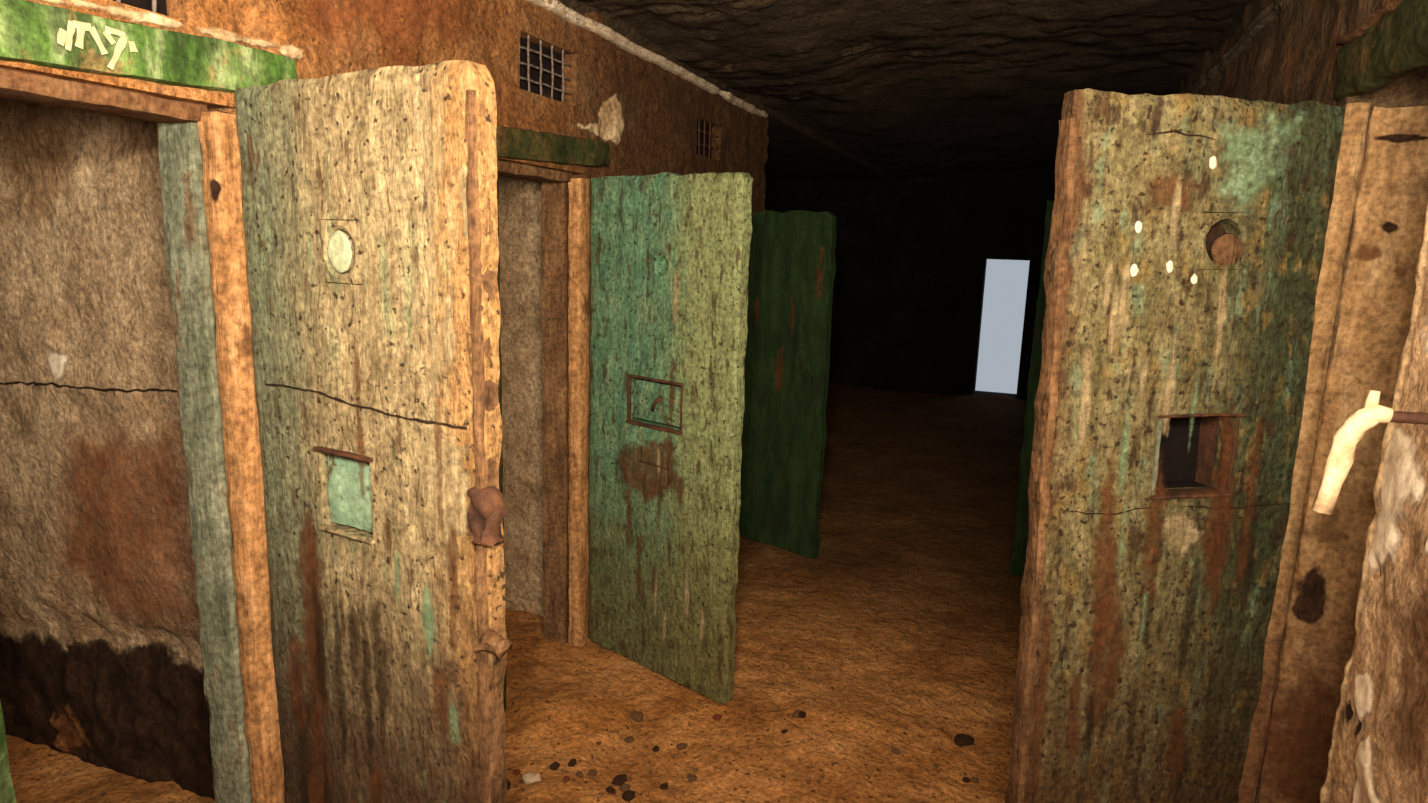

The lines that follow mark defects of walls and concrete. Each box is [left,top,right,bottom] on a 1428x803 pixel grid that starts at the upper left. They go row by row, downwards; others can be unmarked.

crack [0,381,178,393]
rust [300,515,328,735]
rust [448,530,456,644]
rust [619,441,683,593]
flaking render [1369,428,1425,576]
flaking render [1345,672,1380,803]